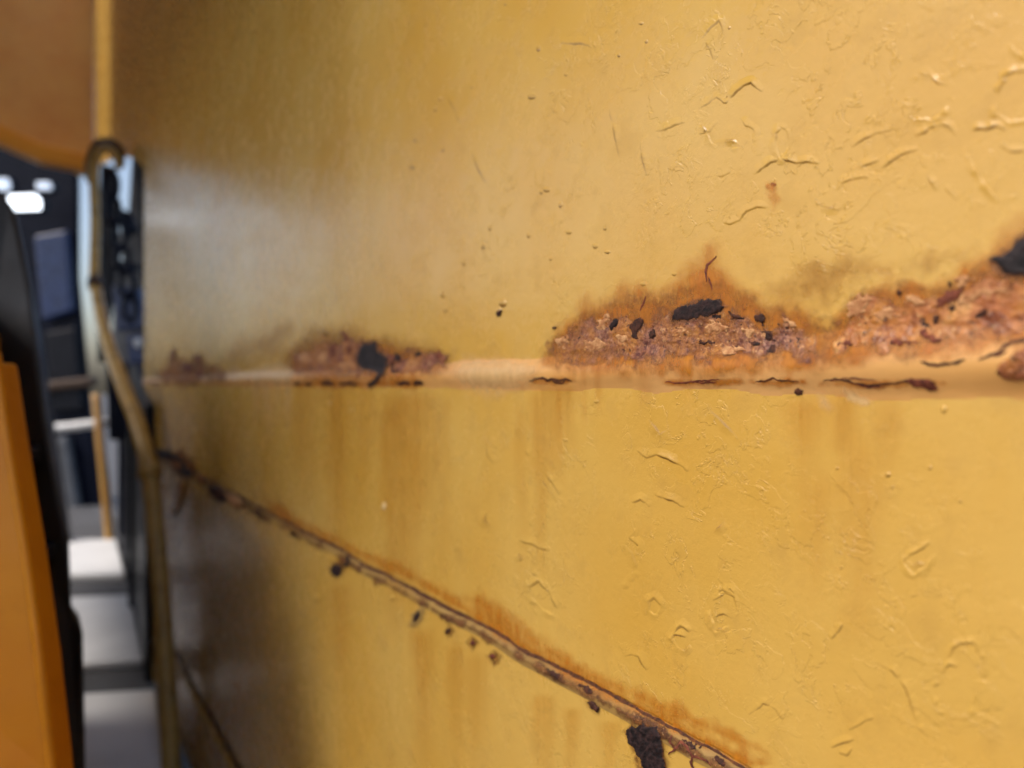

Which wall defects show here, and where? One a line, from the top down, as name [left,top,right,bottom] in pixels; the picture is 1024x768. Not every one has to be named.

corrosion [291,331,447,388]
corrosion [549,257,1024,385]
corrosion [154,448,216,488]
corrosion [419,583,748,768]